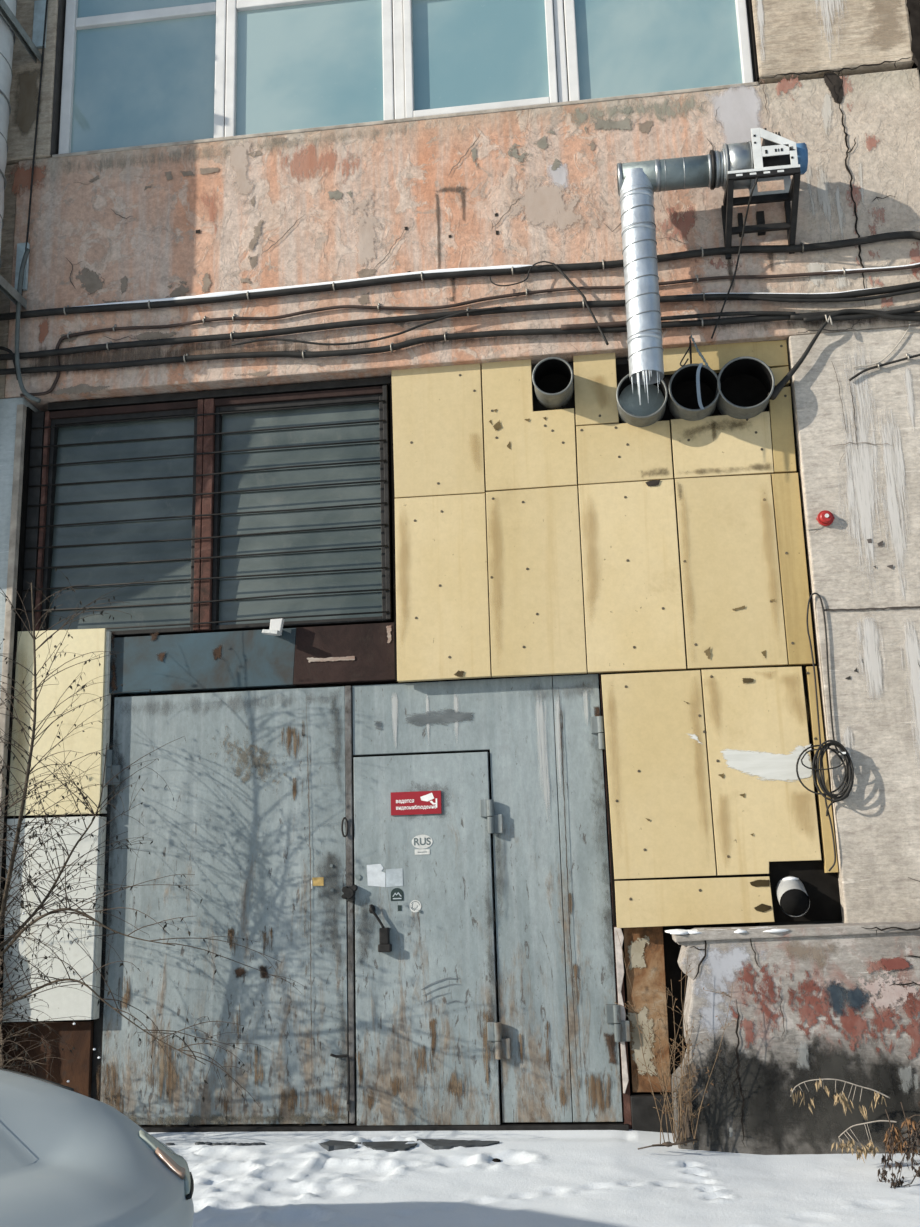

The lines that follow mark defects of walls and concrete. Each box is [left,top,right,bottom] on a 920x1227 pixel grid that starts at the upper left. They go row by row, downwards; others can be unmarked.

peeling [272,137,360,200]
crack [763,57,916,333]
spalling [167,273,212,298]
spalling [241,219,263,284]
leakage [841,349,914,600]
corrosion [235,928,273,978]
peeling [694,942,920,1060]
crack [862,927,920,986]
corrosion [356,1019,466,1110]
corrosion [477,1011,493,1088]
crack [732,1000,745,1146]
leakage [684,1036,920,1155]